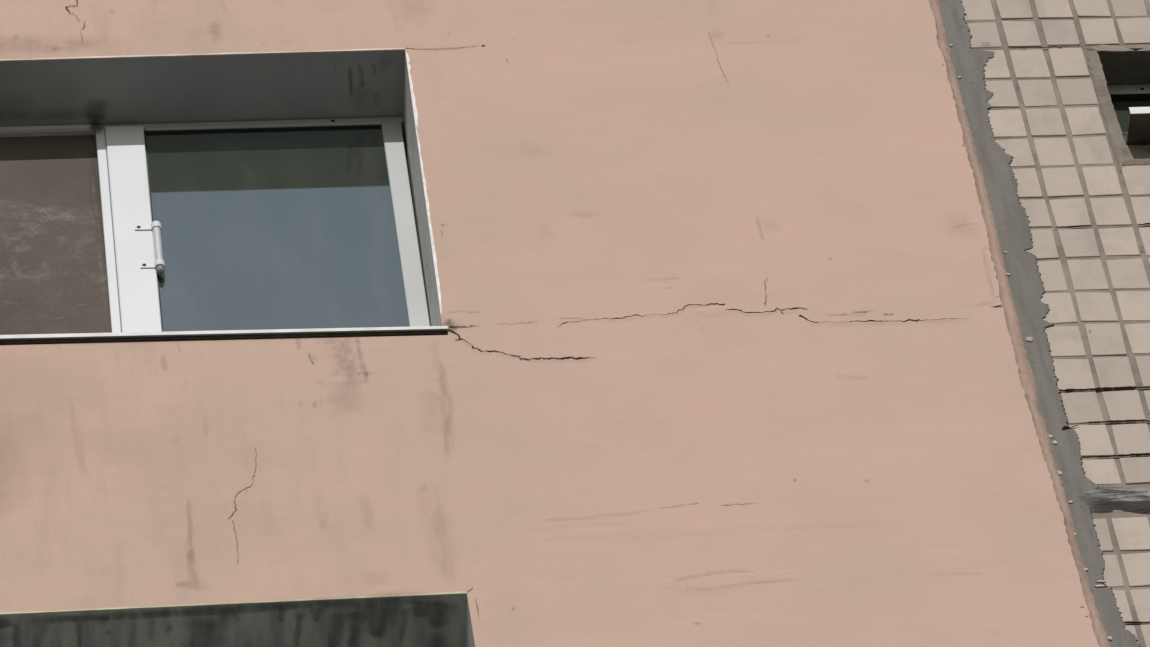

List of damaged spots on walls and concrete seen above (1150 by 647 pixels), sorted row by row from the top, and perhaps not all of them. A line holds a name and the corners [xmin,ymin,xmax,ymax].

crack [557,278,968,327]
crack [448,310,596,364]
crack [228,446,257,562]